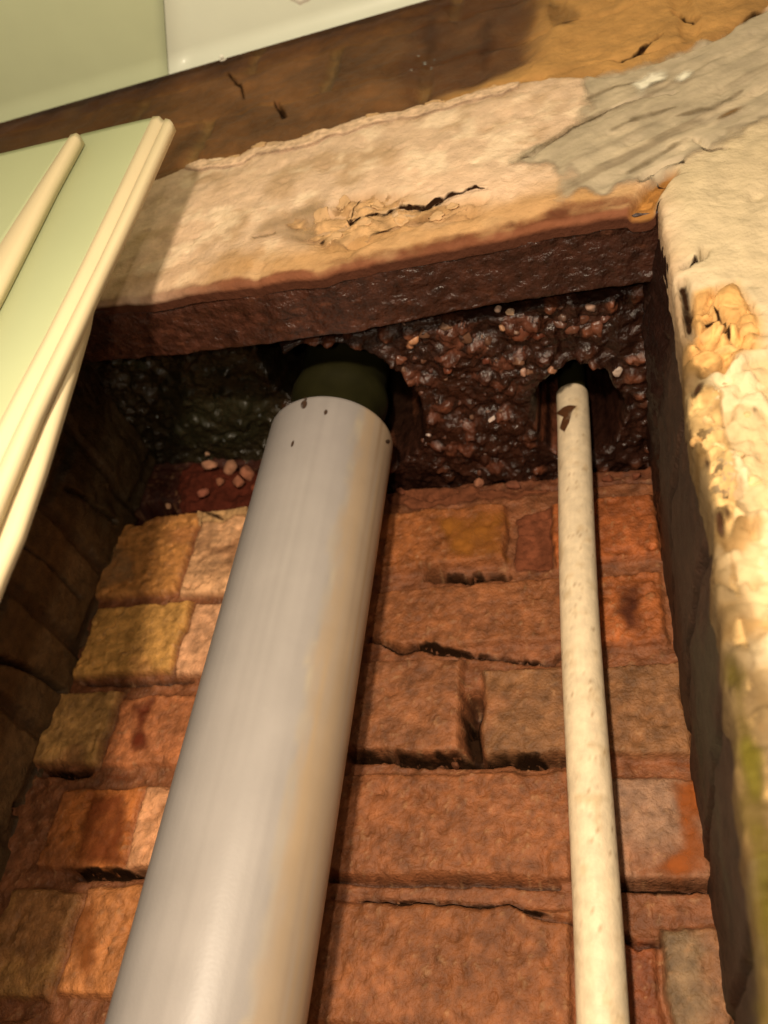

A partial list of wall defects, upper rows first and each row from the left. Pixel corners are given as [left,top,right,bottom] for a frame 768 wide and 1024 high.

crack [347,185,483,225]
spalling [689,383,762,535]
spalling [733,619,748,646]